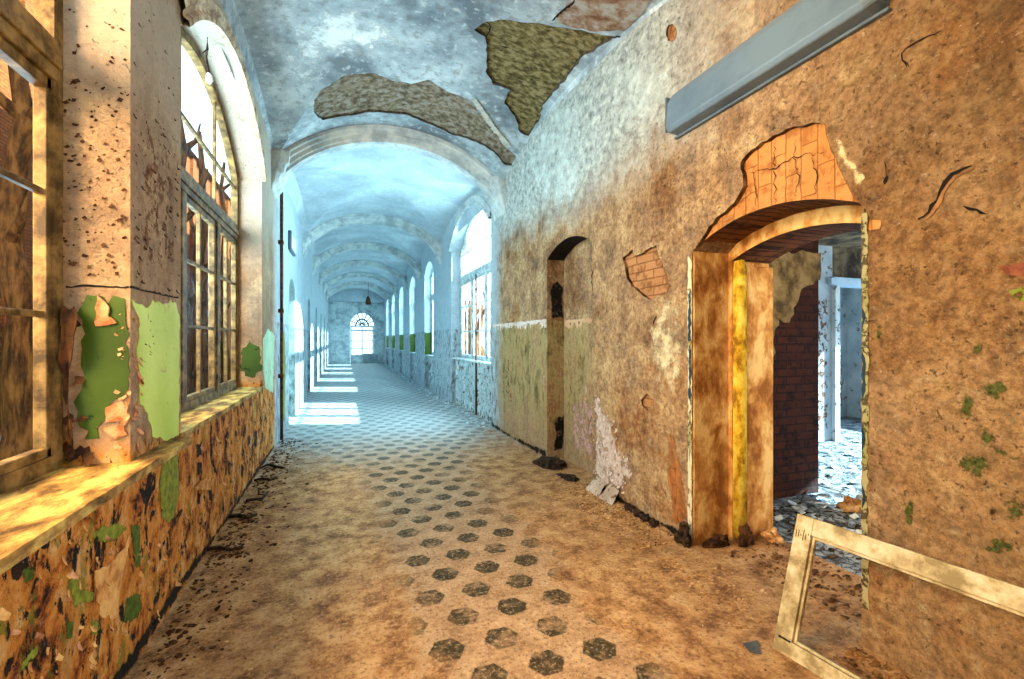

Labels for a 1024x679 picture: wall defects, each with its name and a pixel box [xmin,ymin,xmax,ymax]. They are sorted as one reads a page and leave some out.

spalling [314,73,516,166]
spalling [474,0,652,136]
crack [901,30,942,67]
crack [918,165,986,222]
peeling [58,306,94,467]
peeling [102,313,154,449]
peeling [182,391,274,559]
peeling [571,397,633,494]
spalling [687,122,881,539]
peeling [11,561,42,594]
peeling [28,632,64,679]
flaking render [58,530,168,679]